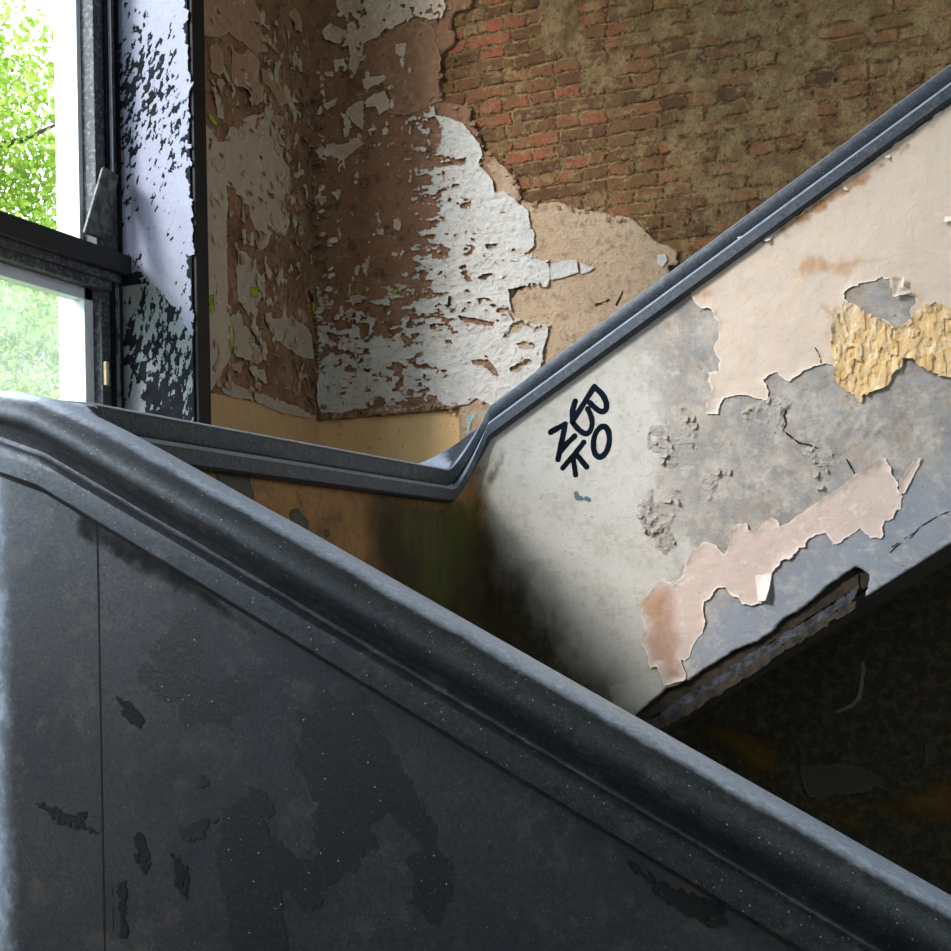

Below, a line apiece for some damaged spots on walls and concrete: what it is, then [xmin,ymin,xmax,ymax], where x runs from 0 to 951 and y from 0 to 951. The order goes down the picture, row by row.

peeling [115,0,195,421]
flaking render [204,0,951,420]
crack [783,410,817,449]
crack [890,511,949,553]
peeling [636,458,921,730]
spalling [116,696,145,729]
spalling [36,802,98,834]
spalling [133,832,151,874]
spalling [116,880,129,939]
spalling [626,859,728,928]